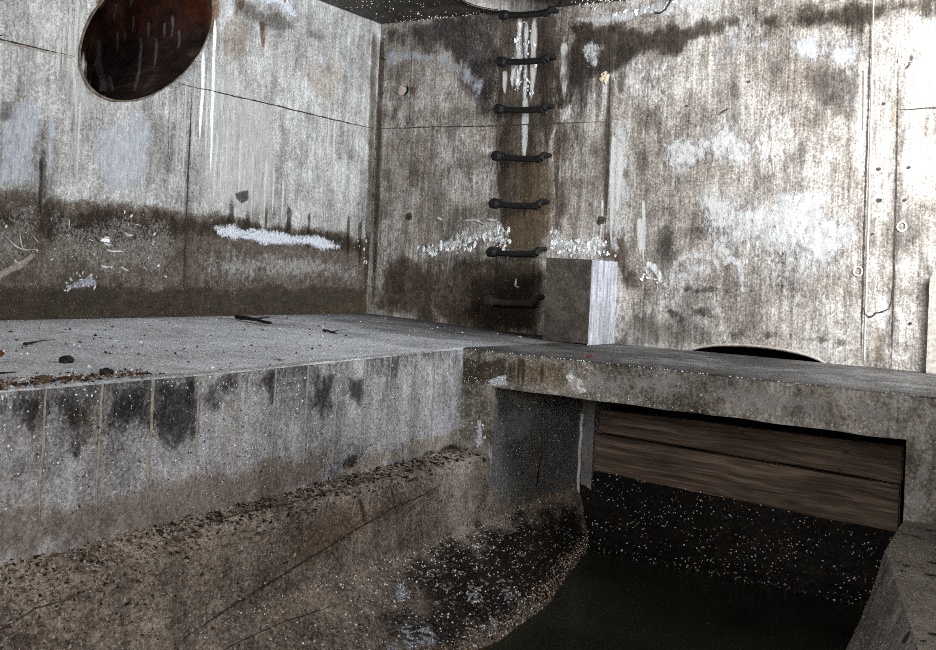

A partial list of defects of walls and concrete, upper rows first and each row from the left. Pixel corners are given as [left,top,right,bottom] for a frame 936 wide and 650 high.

water stain [801,4,882,28]
water stain [560,0,738,107]
water stain [793,38,816,58]
water stain [832,49,853,62]
water stain [388,17,542,156]
water stain [0,0,369,320]
water stain [637,201,646,261]